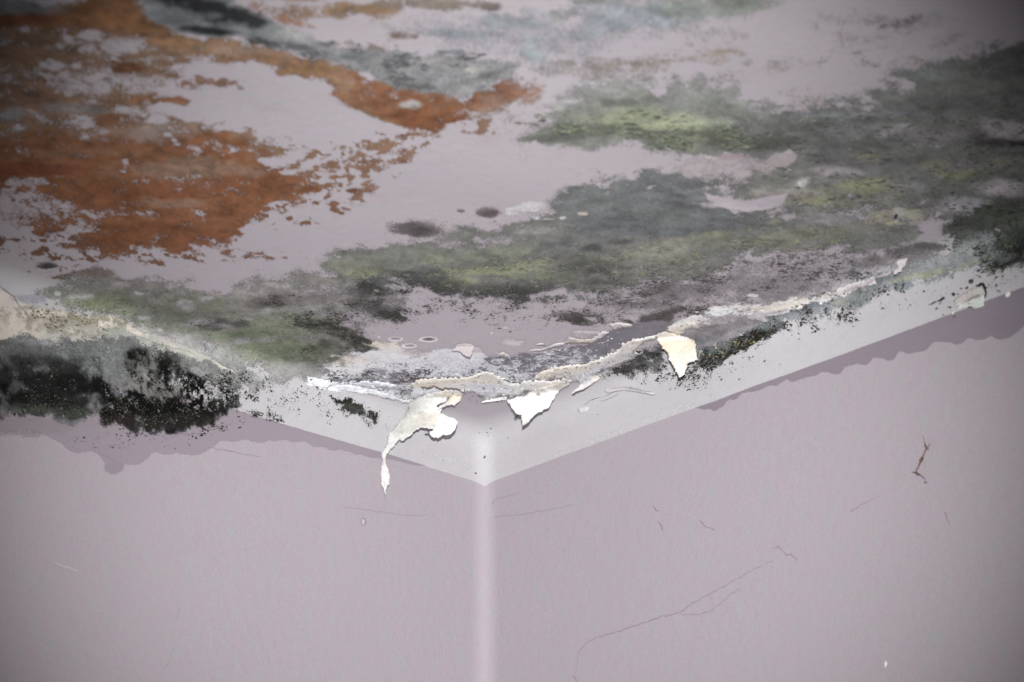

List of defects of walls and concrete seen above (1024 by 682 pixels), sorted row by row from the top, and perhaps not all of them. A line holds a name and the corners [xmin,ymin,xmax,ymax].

rust [0,0,961,280]
water stain [0,35,1024,475]
spalling [923,270,1017,317]
spalling [306,319,698,494]
crack [573,546,798,682]